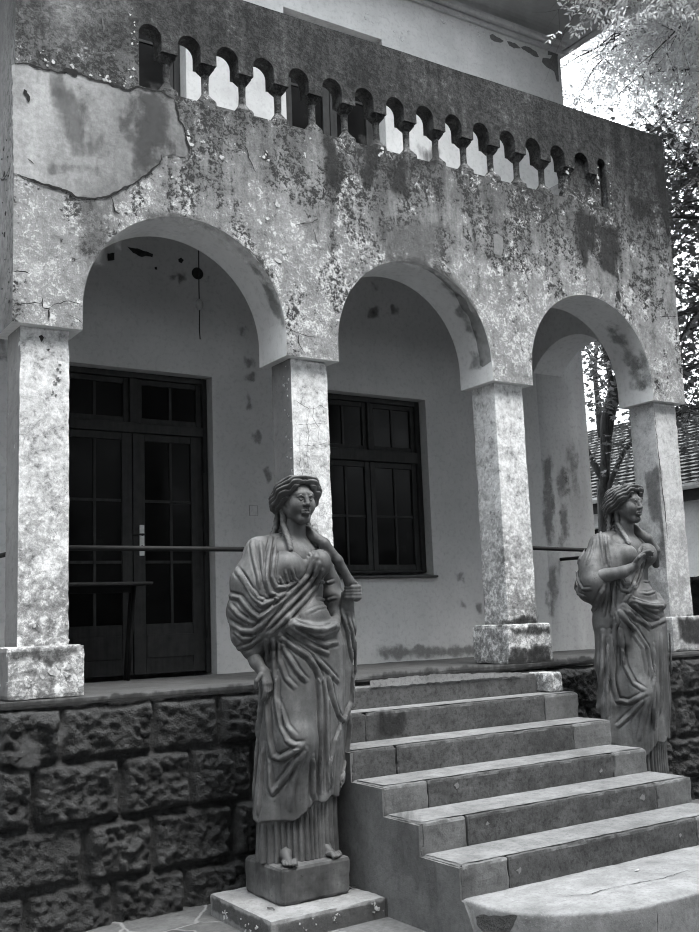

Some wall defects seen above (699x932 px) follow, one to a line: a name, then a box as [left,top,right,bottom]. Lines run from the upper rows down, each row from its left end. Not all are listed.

flaking render [490,34,559,82]
crack [0,155,162,214]
crack [12,62,190,152]
water stain [120,94,171,171]
water stain [323,134,343,192]
water stain [360,136,411,200]
water stain [576,209,621,275]
crack [14,298,81,322]
crack [297,401,324,475]
water stain [372,615,594,680]
water stain [0,685,259,709]
spalling [476,914,517,932]